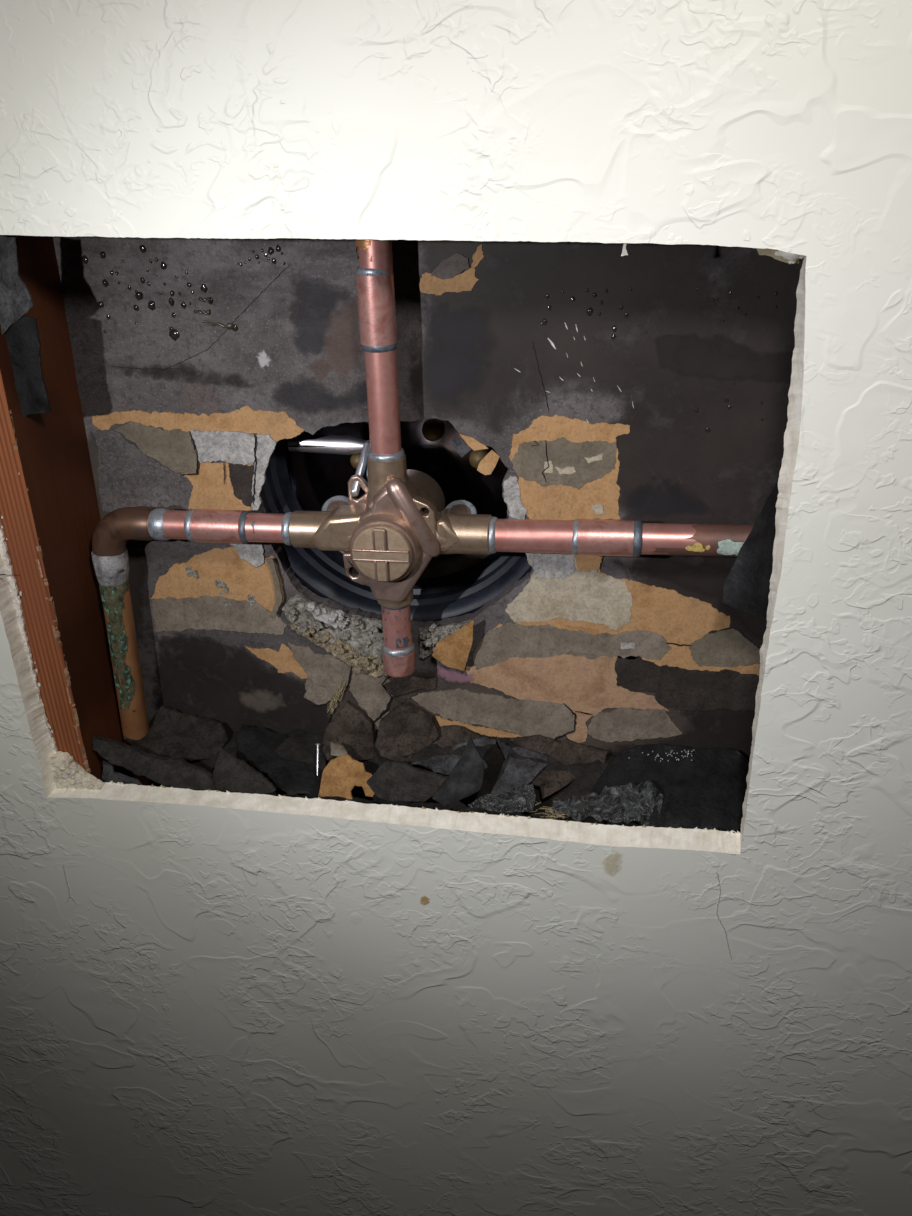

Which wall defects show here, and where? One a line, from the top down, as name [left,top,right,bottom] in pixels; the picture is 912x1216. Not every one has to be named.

leakage [410,240,803,525]
spalling [282,594,388,678]
spalling [419,618,474,659]
peeling [318,742,374,799]